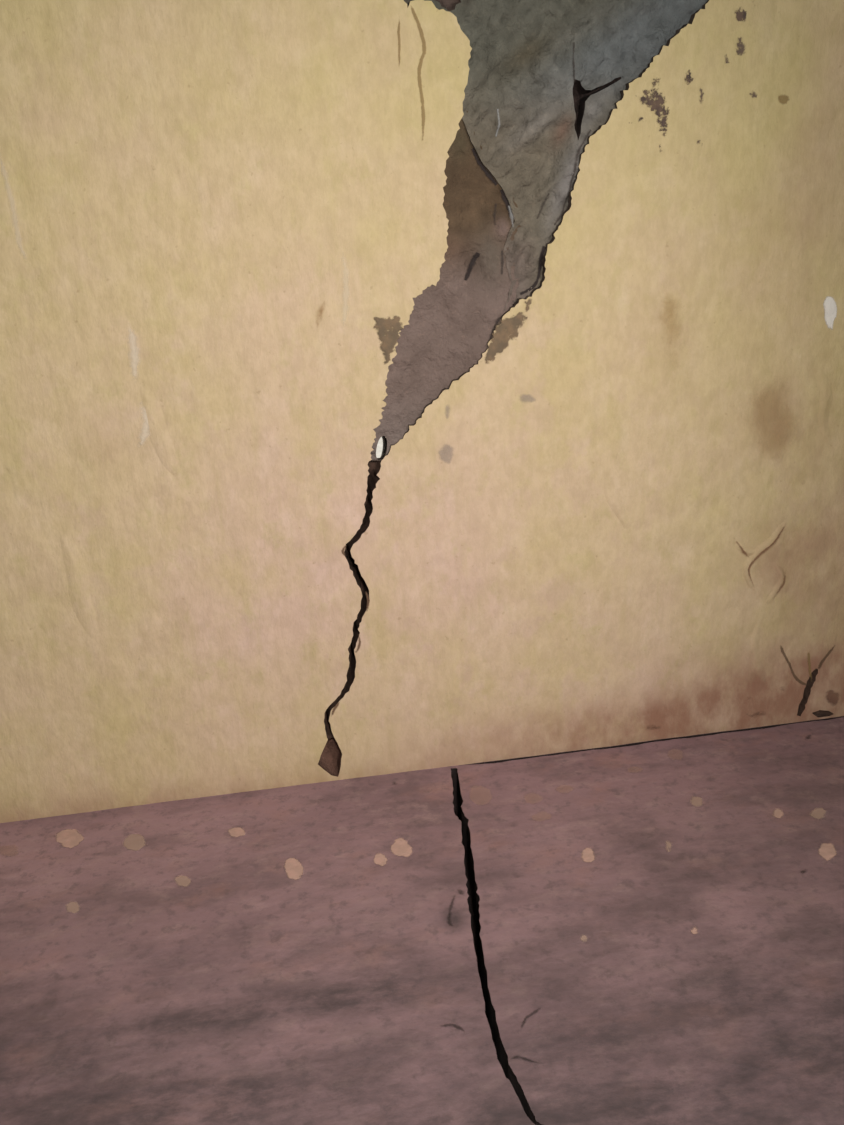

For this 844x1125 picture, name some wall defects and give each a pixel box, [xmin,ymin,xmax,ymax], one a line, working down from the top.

flaking render [370,0,709,461]
crack [318,461,381,777]
crack [444,647,844,1125]